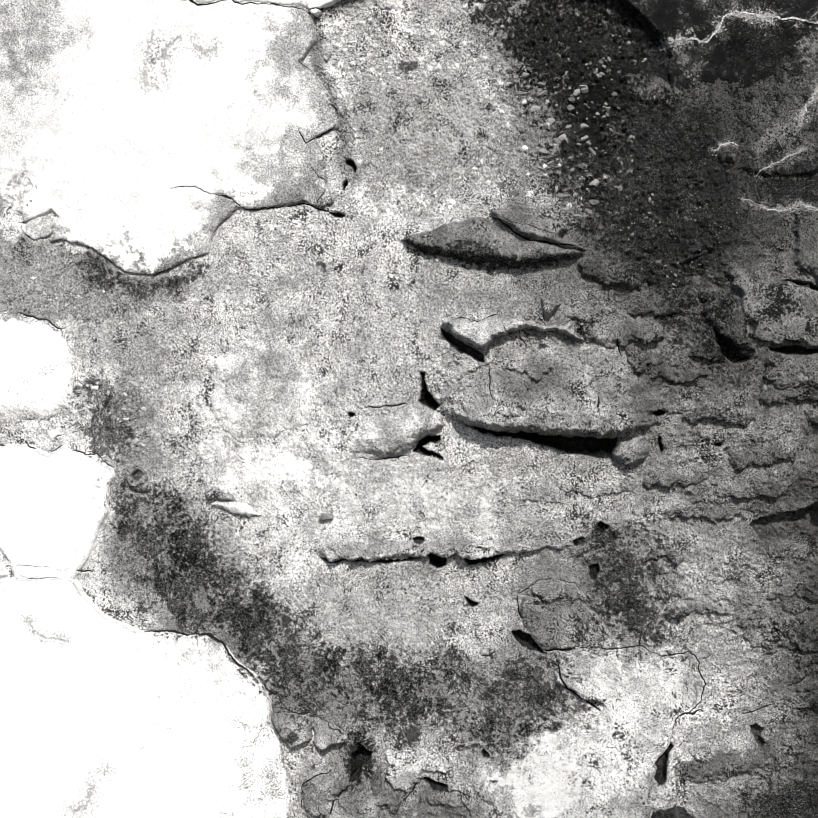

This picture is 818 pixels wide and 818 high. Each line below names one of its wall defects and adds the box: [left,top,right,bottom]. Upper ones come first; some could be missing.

crack [184,0,325,20]
damp [306,0,339,9]
damp [0,0,306,305]
spalling [0,198,334,324]
spalling [234,0,675,233]
damp [341,0,818,405]
spalling [724,262,802,346]
spalling [792,214,818,284]
spalling [0,410,292,818]
damp [67,368,698,818]
crack [516,578,580,619]
crack [545,635,711,736]